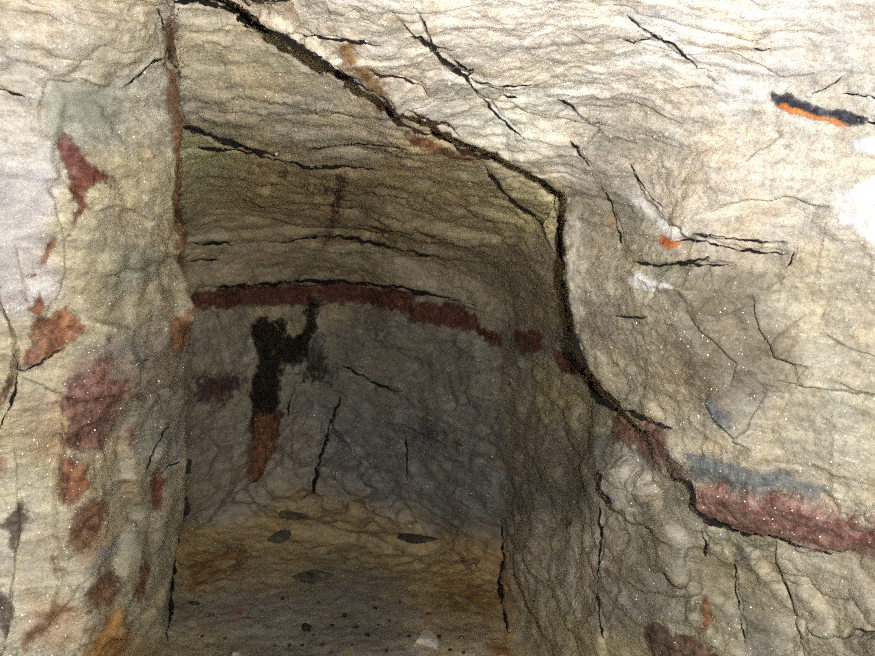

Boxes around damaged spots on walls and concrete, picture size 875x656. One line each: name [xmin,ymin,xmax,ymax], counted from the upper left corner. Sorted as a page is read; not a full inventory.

crack [250,0,290,8]
crack [126,58,162,85]
crack [411,5,532,140]
crack [0,88,25,97]
crack [812,75,875,99]
crack [180,67,568,325]
crack [614,313,648,321]
crack [341,364,401,392]
crack [300,396,341,500]
crack [596,470,612,639]